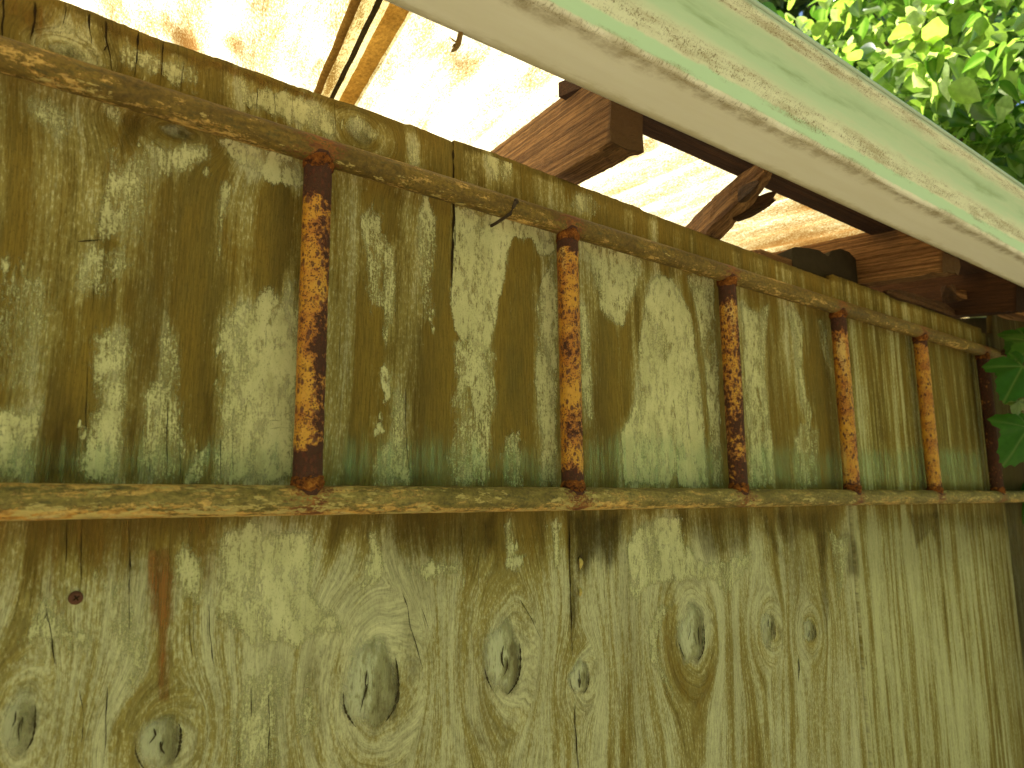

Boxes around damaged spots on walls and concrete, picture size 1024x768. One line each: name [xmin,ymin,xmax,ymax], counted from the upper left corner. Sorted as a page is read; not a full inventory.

crack [449,204,457,291]
corrosion [149,551,172,686]